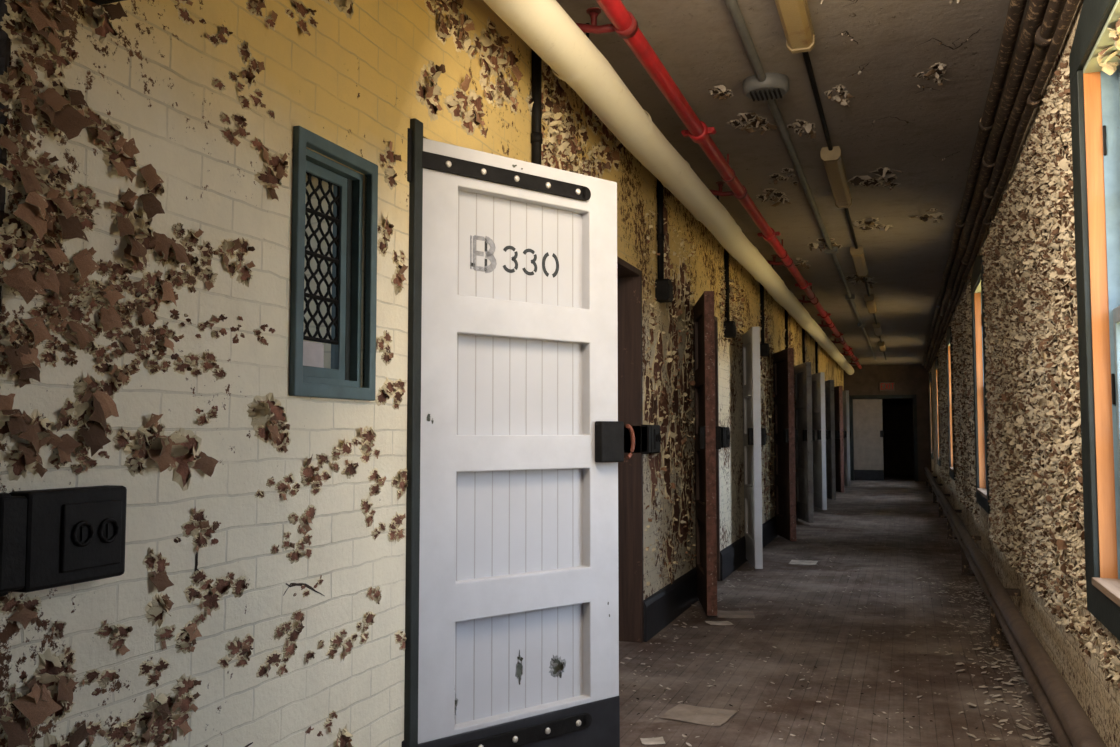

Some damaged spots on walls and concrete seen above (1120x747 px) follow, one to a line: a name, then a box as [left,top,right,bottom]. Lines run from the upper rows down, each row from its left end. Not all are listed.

peeling [1097,18,1120,75]
peeling [415,0,624,178]
peeling [378,141,402,190]
peeling [377,215,408,295]
peeling [374,330,405,410]
peeling [938,46,1120,690]
peeling [174,506,221,553]
peeling [255,426,408,564]
peeling [0,547,249,747]
peeling [217,575,382,678]
peeling [515,650,523,685]
peeling [549,655,566,678]